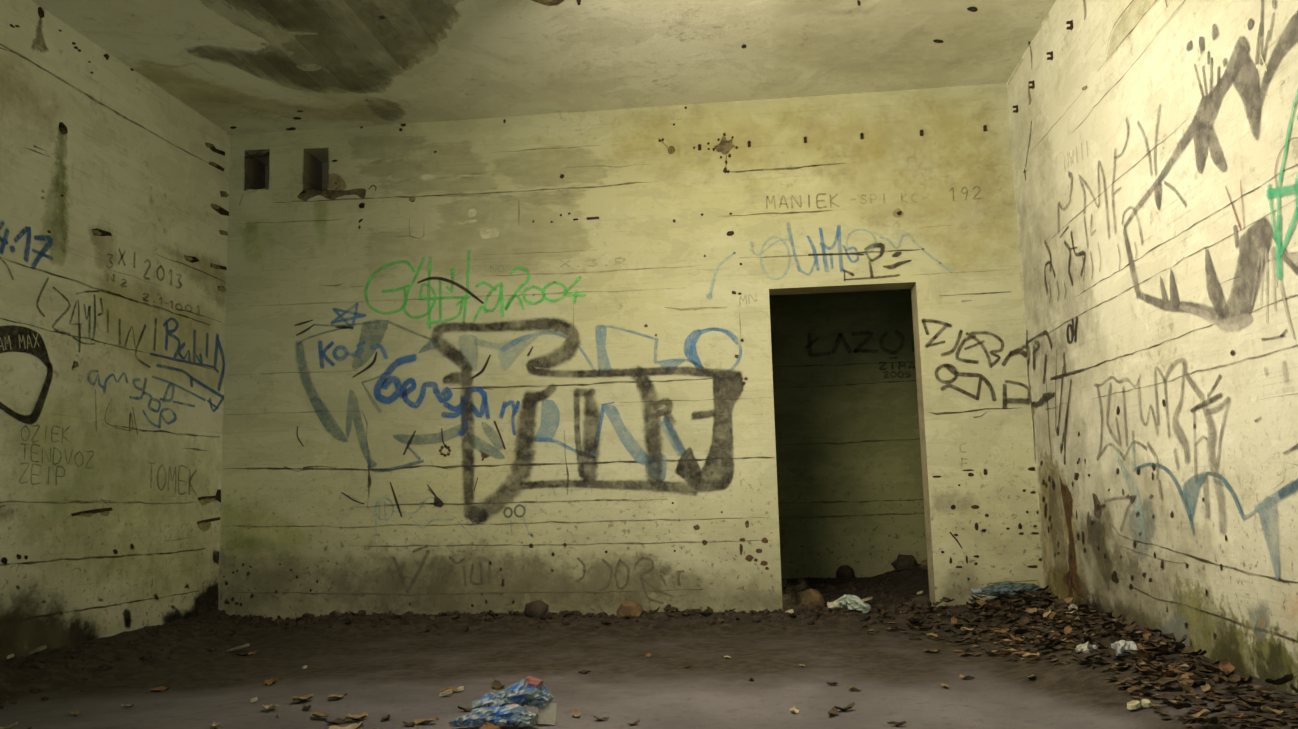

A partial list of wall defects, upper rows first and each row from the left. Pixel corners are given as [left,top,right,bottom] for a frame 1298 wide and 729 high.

rust [32,7,46,50]
rust [1040,458,1122,604]
leakage [0,586,98,661]
leakage [1046,562,1297,691]